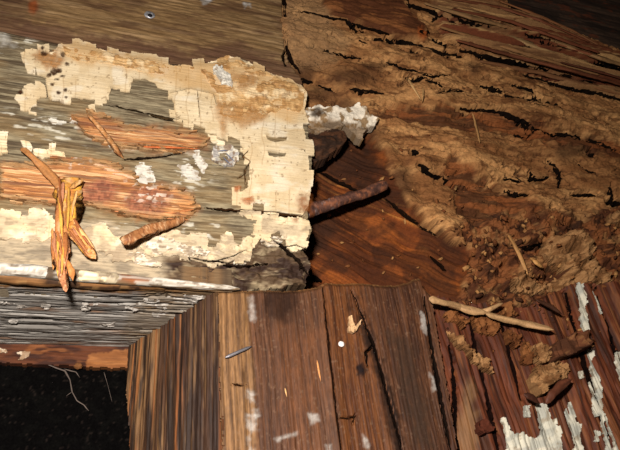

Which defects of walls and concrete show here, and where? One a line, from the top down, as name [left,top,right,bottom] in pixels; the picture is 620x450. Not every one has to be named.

crack [282,0,620,174]
peeling [14,38,314,268]
crack [411,150,449,185]
crack [503,160,620,208]
peeling [0,200,55,244]
crack [385,199,436,236]
peeling [0,262,48,278]
peeling [125,277,236,318]
crack [273,240,356,450]
crack [351,291,402,450]
peeling [575,282,619,450]
peeling [500,402,584,450]